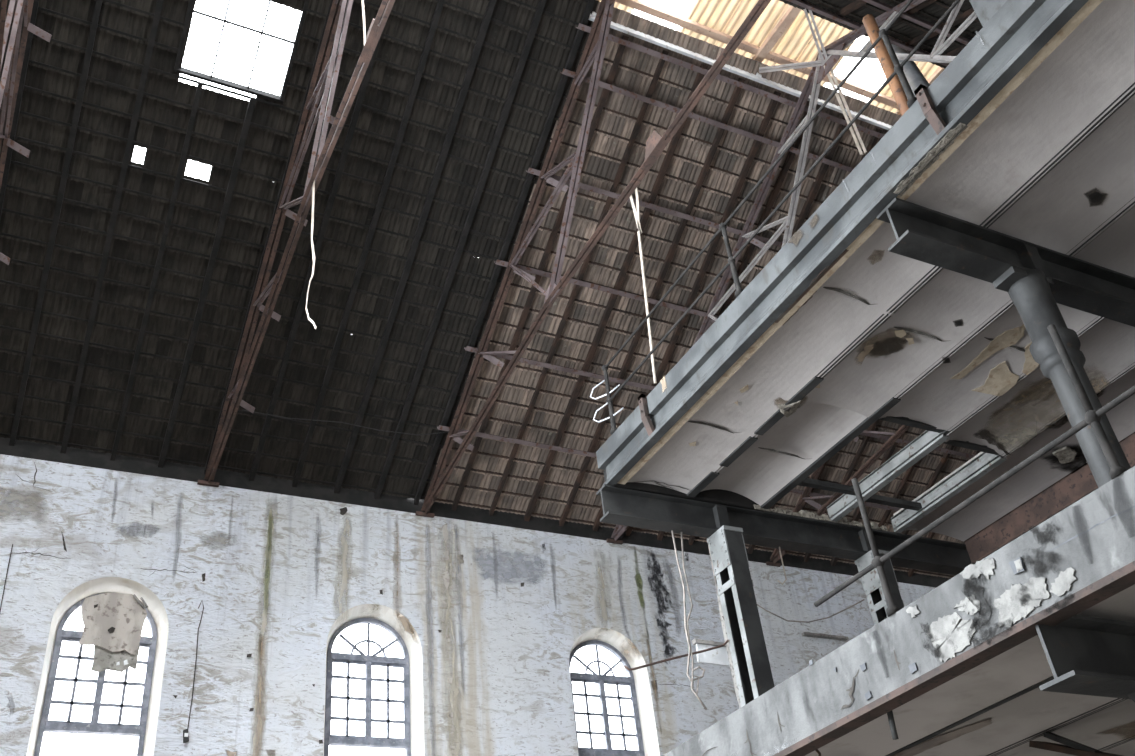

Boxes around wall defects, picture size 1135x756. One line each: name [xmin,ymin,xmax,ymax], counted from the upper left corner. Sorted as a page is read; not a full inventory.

damp [856,329,915,363]
damp [208,533,230,546]
damp [633,553,679,701]
spalling [906,524,1077,662]